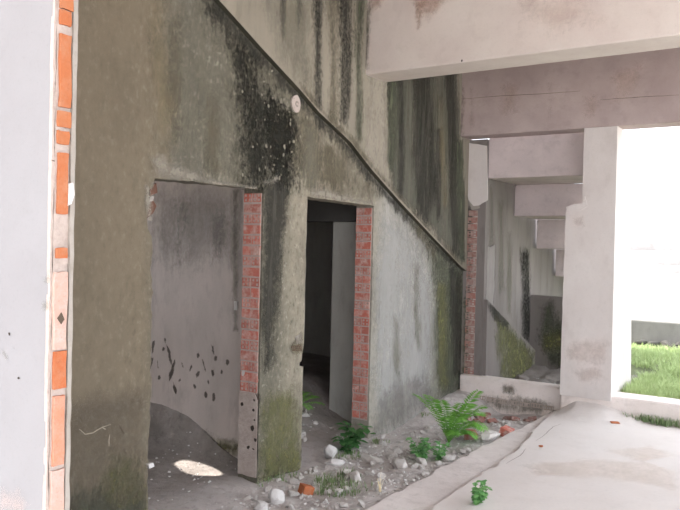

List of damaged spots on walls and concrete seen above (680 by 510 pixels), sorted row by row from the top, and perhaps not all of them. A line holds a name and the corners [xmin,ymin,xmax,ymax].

spalling [162,339,181,394]
water stain [205,0,307,370]
water stain [313,0,369,140]
water stain [378,74,473,401]